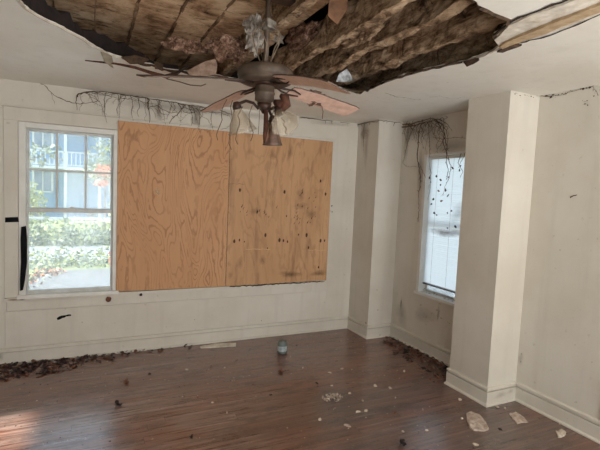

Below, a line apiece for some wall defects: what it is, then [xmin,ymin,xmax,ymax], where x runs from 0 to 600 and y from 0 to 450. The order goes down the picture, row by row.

flaking render [494,0,600,53]